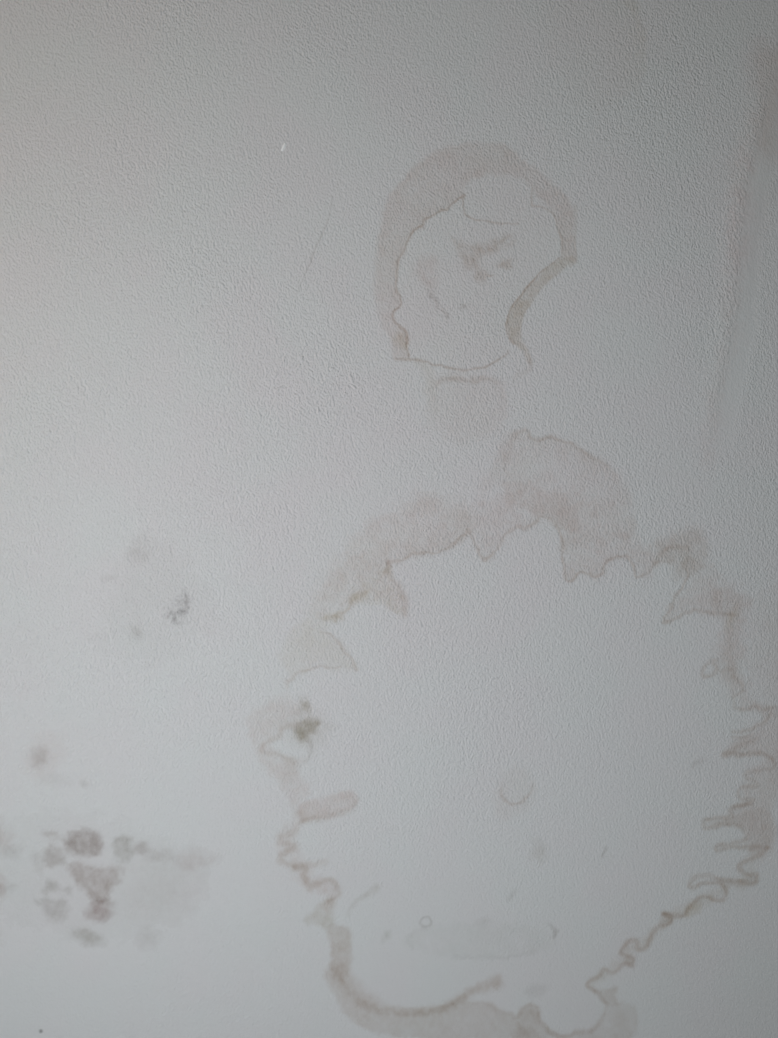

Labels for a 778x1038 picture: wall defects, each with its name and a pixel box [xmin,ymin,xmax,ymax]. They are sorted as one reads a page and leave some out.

damp [0,806,224,952]
damp [241,139,778,1038]